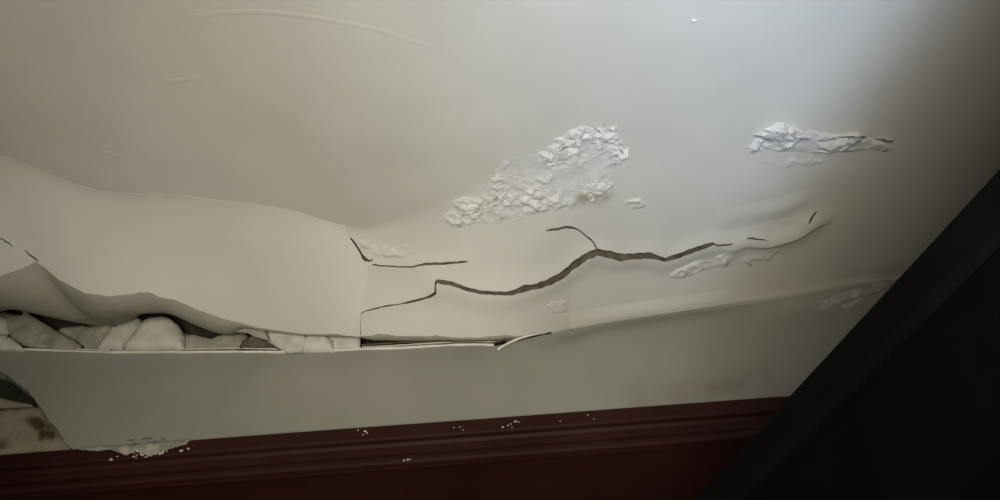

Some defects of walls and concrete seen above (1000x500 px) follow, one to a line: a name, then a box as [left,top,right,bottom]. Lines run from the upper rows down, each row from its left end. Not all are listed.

spalling [746,122,893,154]
spalling [443,122,629,229]
crack [351,226,769,314]
spalling [668,247,780,279]
peeling [0,311,82,352]
peeling [235,328,306,354]
spalling [0,379,191,461]